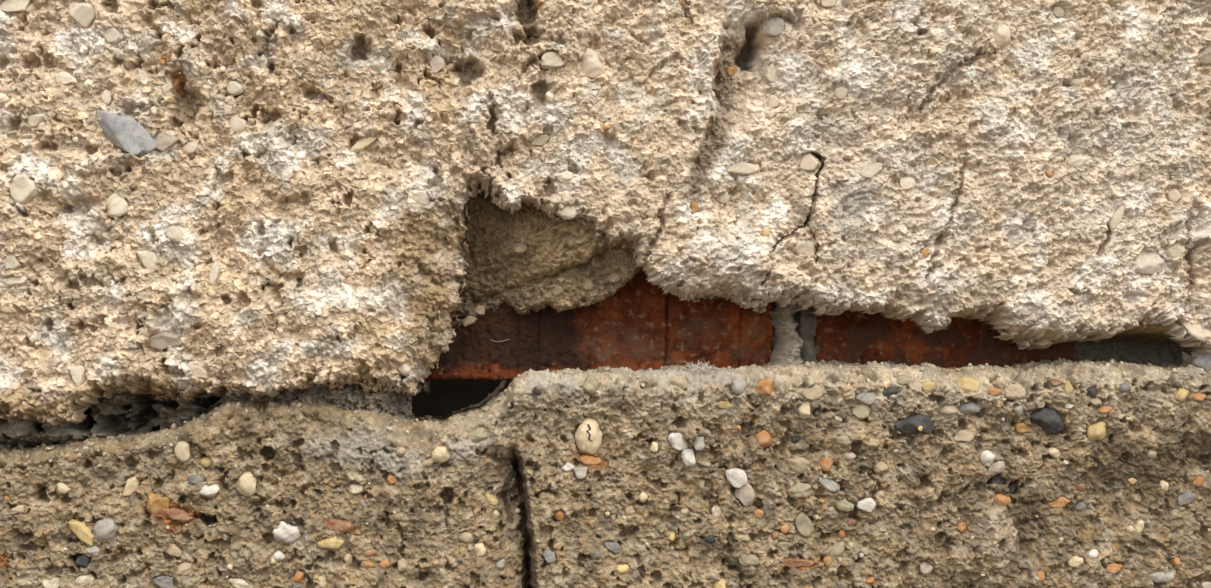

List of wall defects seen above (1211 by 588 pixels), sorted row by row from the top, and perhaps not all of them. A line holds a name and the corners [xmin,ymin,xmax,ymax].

spalling [452,191,644,327]
crack [501,443,538,588]